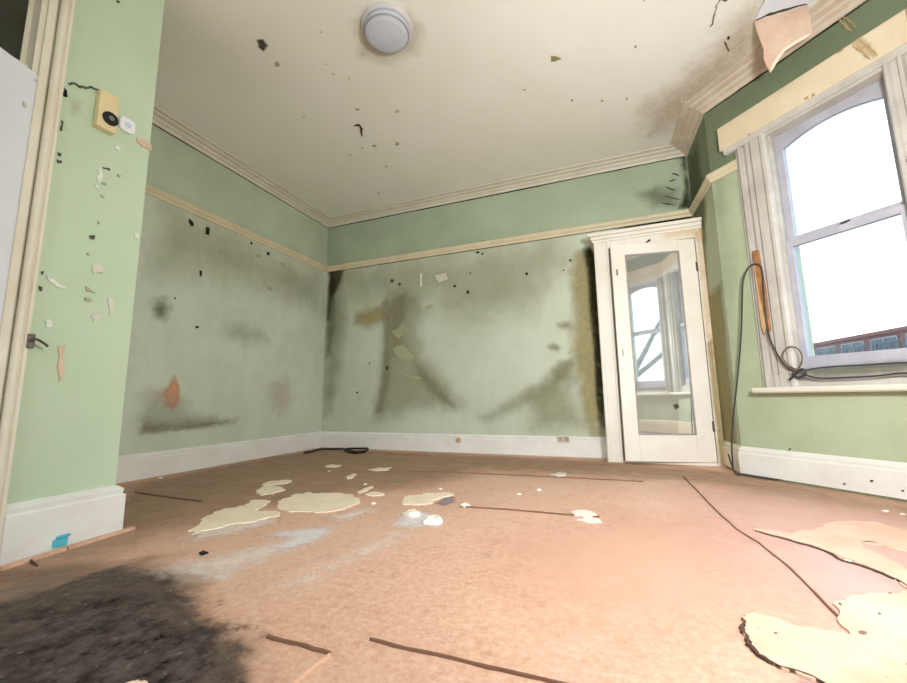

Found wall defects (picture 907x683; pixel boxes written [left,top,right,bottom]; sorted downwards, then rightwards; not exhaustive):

peeling [755,0,813,21]
leakage [622,152,705,263]
leakage [327,270,343,320]
leakage [575,247,604,433]